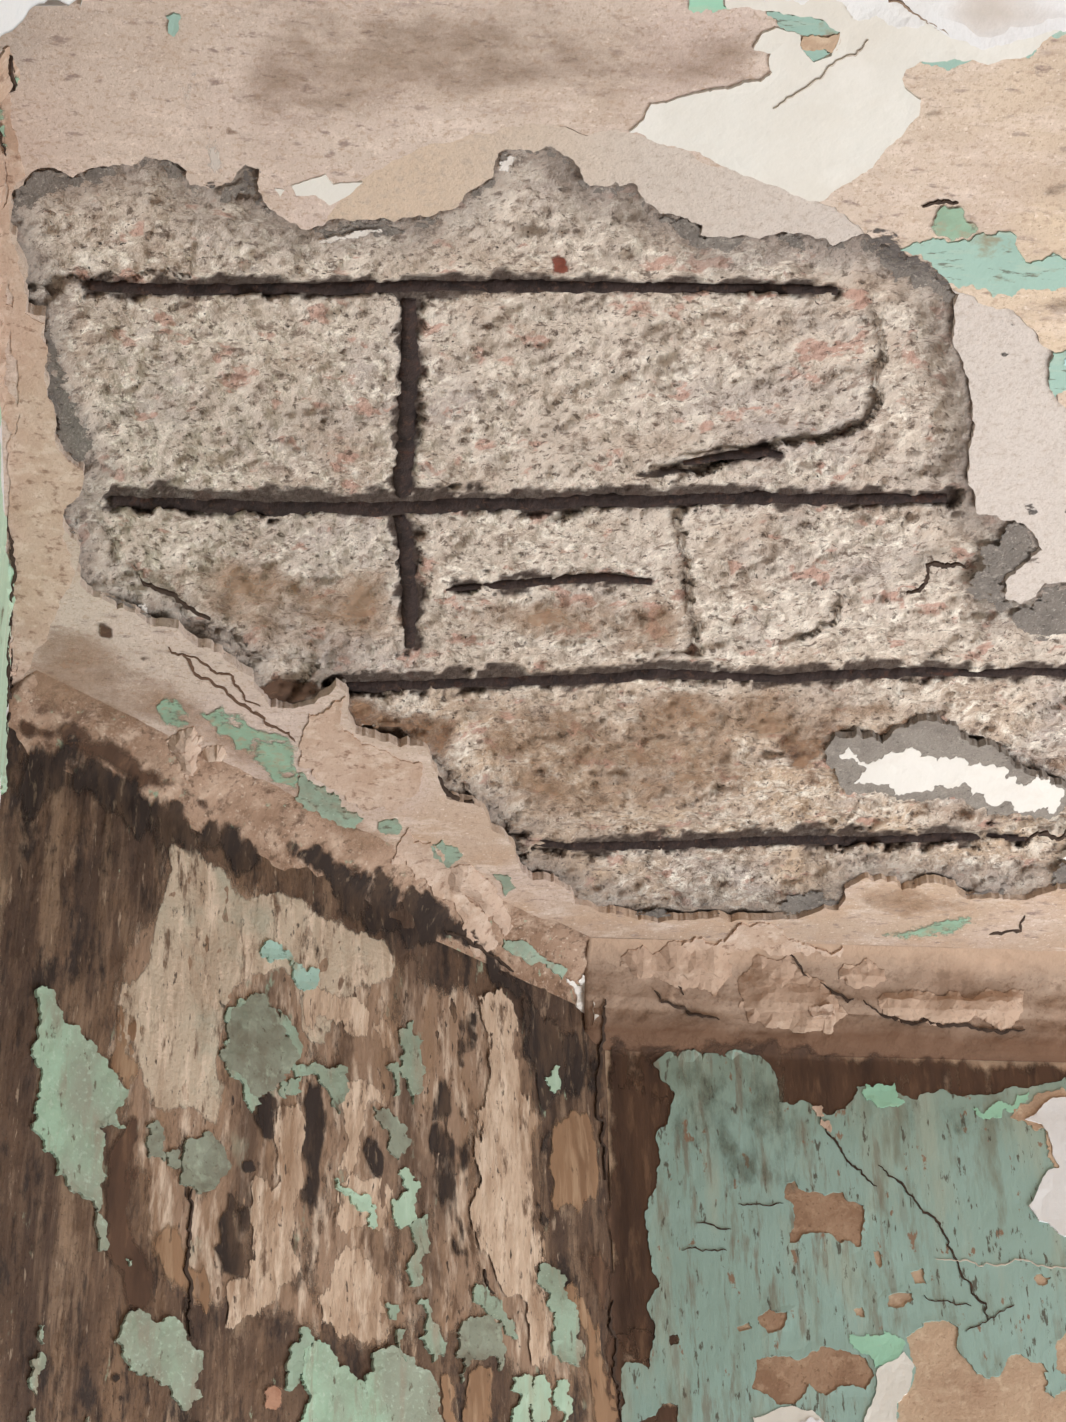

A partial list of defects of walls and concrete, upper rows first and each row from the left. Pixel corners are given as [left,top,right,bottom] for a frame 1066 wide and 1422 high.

rust [552,256,569,274]
spalling [0,0,1066,1020]
rust [636,456,777,480]
crack [169,647,295,742]
rust [259,679,321,704]
damp [12,721,259,877]
crack [789,954,1025,1035]
damp [254,1092,277,1140]
peeling [27,844,1066,1422]
damp [103,1117,156,1310]
damp [215,1194,250,1278]
crack [820,1116,1066,1332]